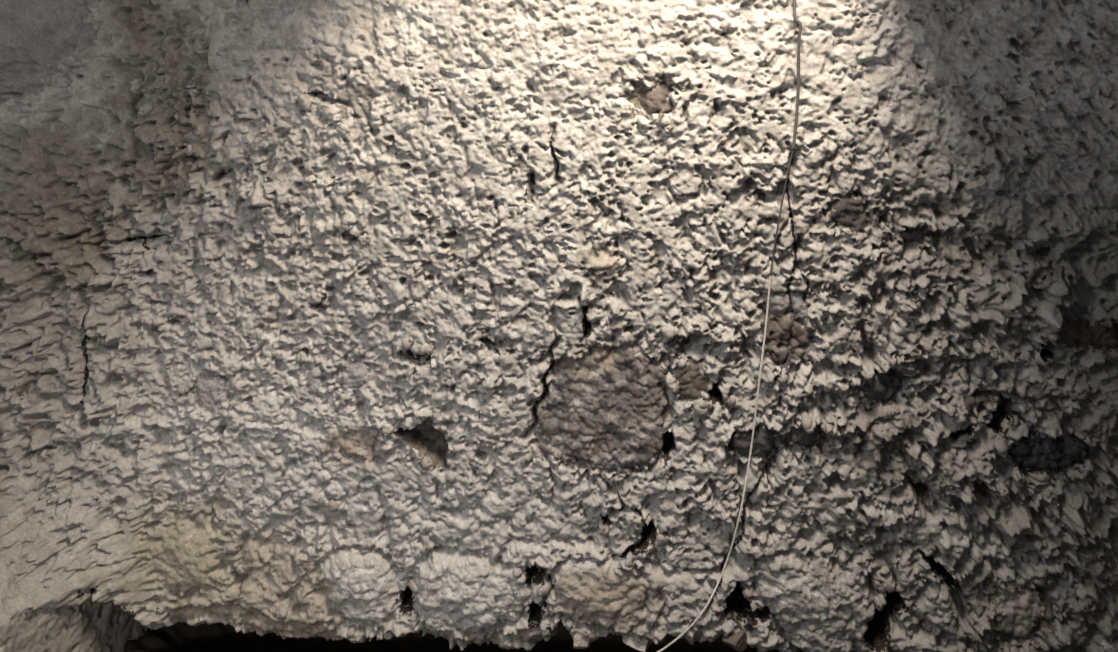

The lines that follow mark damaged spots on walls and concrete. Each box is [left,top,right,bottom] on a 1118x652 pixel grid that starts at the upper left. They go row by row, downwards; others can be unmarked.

spalling [622,72,690,130]
crack [550,129,561,176]
crack [773,147,809,386]
crack [79,303,99,404]
spalling [319,417,456,483]
crack [527,338,560,433]
spalling [521,304,736,492]
crack [706,439,787,614]
spalling [907,467,946,506]
spalling [946,339,1094,502]
hole [720,581,791,626]
hole [863,579,909,652]